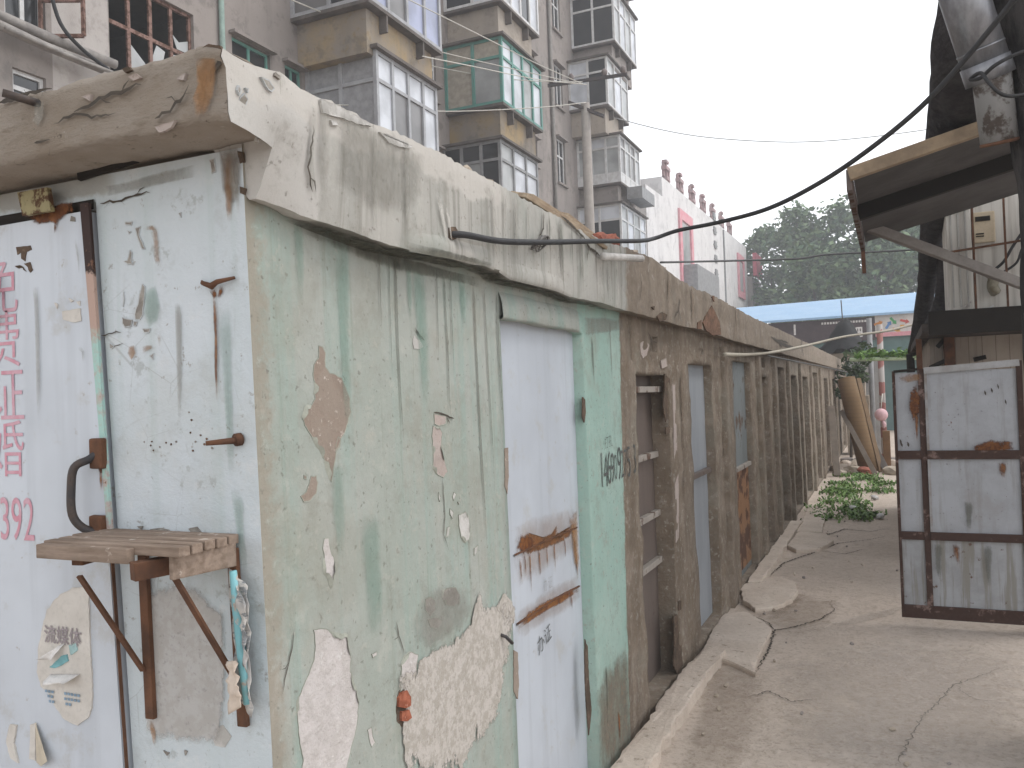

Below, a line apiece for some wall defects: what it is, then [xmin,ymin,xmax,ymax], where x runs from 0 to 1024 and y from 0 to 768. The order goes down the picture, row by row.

crack [34,80,141,144]
crack [307,125,316,192]
crack [100,187,149,206]
damp [301,222,597,409]
peeling [300,345,352,502]
damp [475,295,502,486]
corrosion [907,374,920,436]
corrosion [974,440,1013,450]
corrosion [518,522,579,577]
corrosion [524,589,573,624]
peeling [296,628,376,768]
peeling [396,595,519,768]